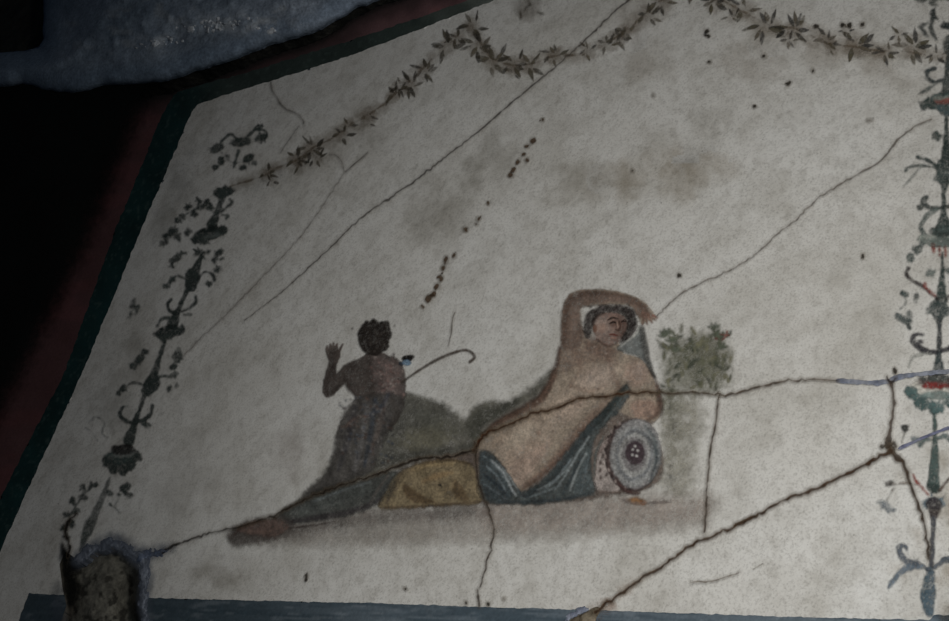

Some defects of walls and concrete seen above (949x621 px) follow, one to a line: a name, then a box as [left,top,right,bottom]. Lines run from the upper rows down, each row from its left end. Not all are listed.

crack [245,0,629,320]
crack [668,119,932,305]
flaking render [61,535,169,621]
crack [162,369,949,614]
flaking render [565,606,600,621]